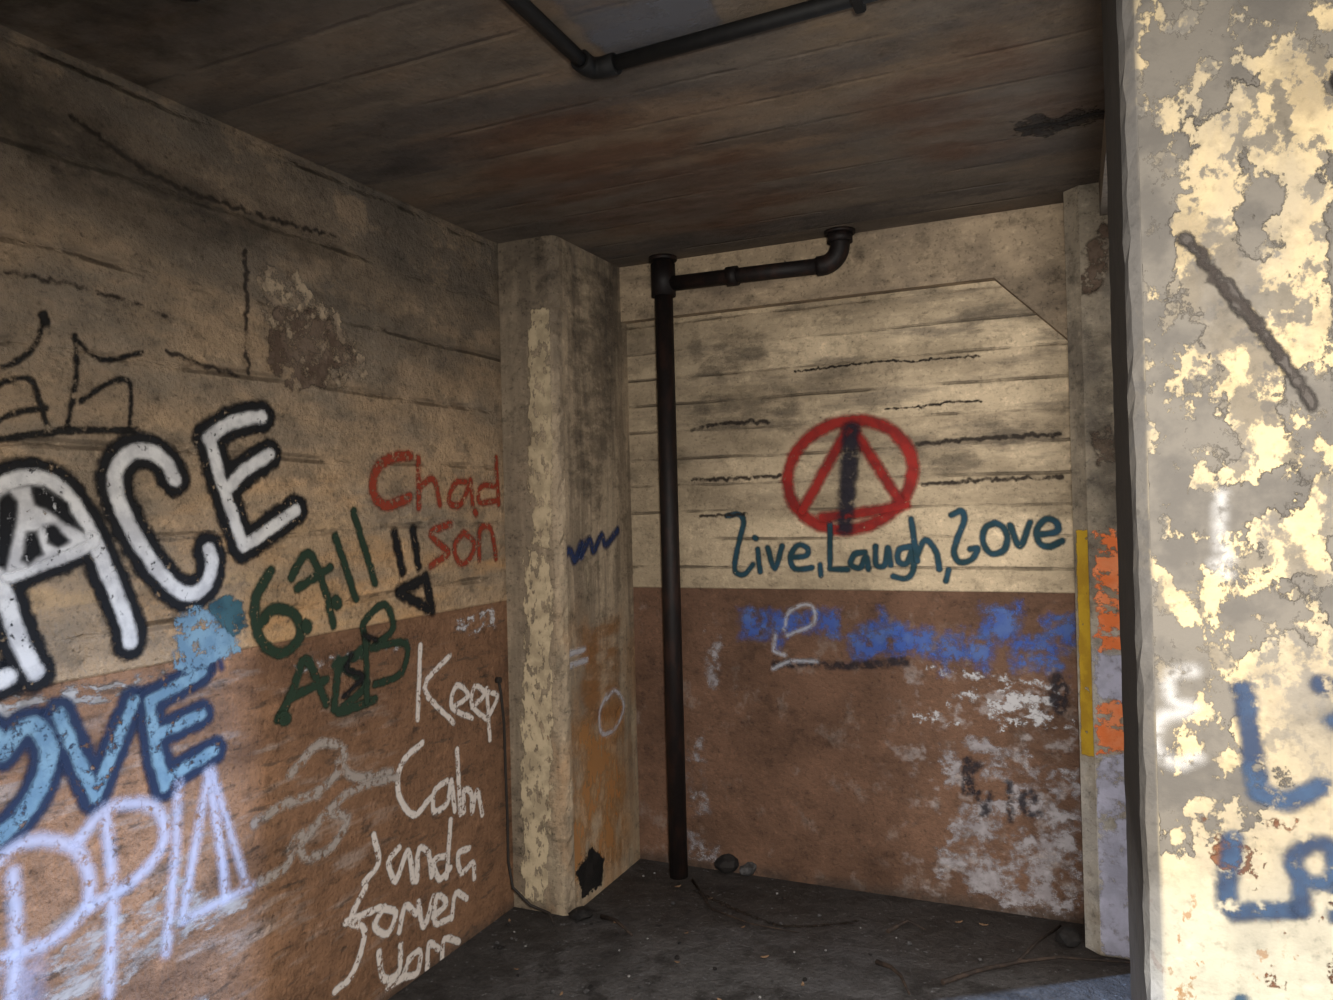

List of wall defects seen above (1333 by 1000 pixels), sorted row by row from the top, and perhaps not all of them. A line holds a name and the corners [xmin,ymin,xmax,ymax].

spalling [256,264,368,391]
peeling [1135,0,1333,858]
peeling [0,671,165,718]
peeling [962,684,1069,732]
spalling [576,847,605,898]
peeling [936,736,1082,913]